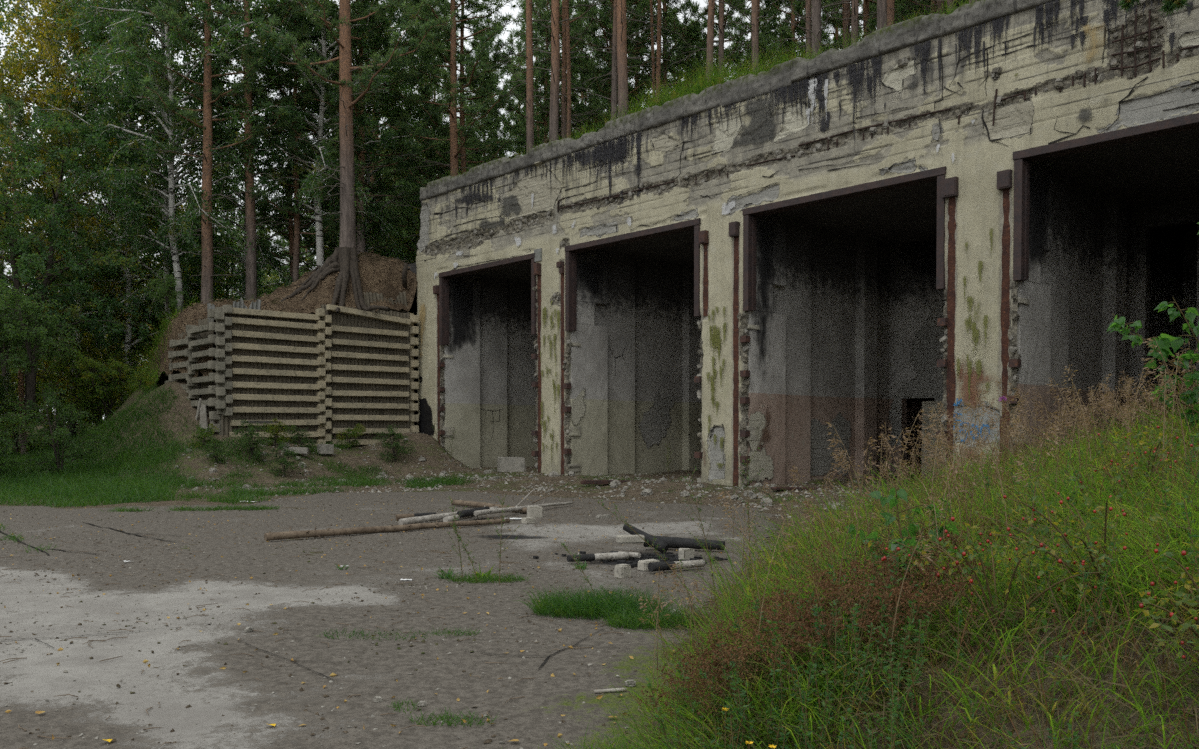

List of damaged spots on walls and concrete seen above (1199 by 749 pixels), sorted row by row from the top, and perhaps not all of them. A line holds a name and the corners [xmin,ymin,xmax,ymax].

spalling [416,0,1199,256]
leakage [908,15,1018,96]
crack [828,18,1199,146]
leakage [1076,108,1092,122]
leakage [1033,0,1175,52]
leakage [455,132,641,230]
crack [631,138,915,230]
leakage [706,306,726,469]